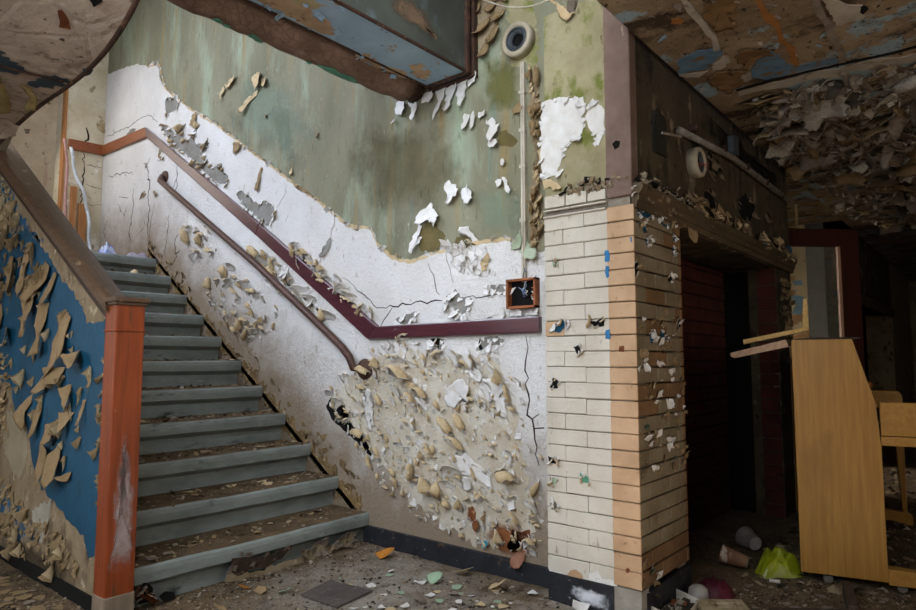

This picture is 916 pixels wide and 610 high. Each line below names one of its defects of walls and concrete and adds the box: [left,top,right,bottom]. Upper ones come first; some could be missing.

peeling [472,0,506,57]
peeling [0,174,106,558]
peeling [148,239,372,376]
flaking render [146,60,579,321]
crack [344,252,503,325]
crack [524,338,544,466]
peeling [549,318,570,333]
peeling [586,314,605,329]
peeling [637,308,691,474]
peeling [637,209,698,257]
peeling [740,64,916,235]
peeling [0,477,79,583]